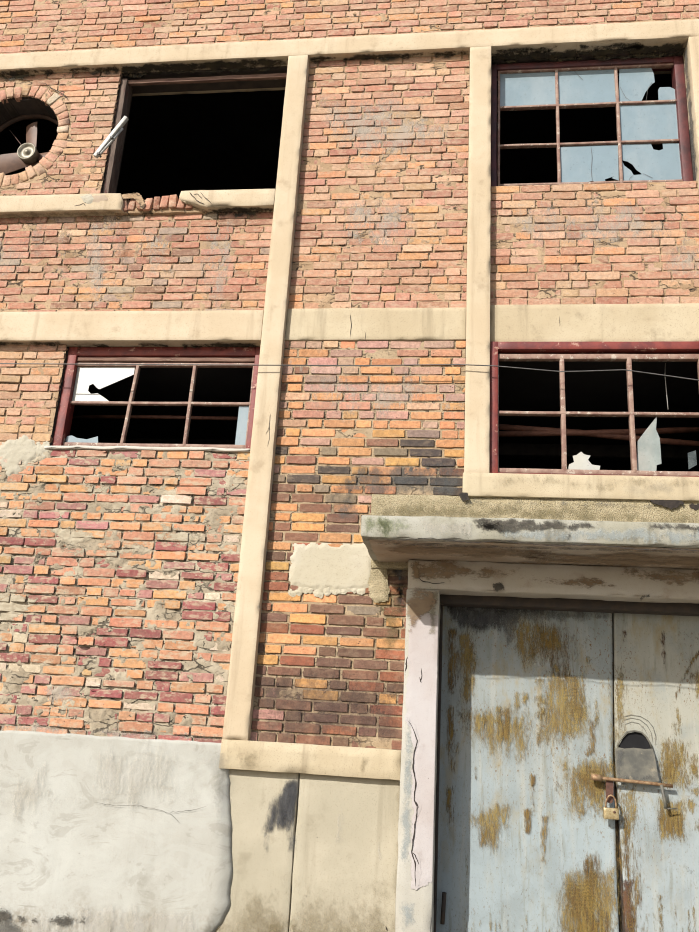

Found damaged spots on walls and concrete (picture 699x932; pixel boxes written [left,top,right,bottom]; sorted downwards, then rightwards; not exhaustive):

leakage [491,42,697,179]
peeling [122,193,193,213]
leakage [380,522,699,569]
peeling [288,568,390,603]
peeling [412,560,515,592]
peeling [550,577,614,588]
peeling [626,568,699,585]
rust [675,651,699,698]
rust [446,617,645,932]
rust [657,710,699,842]
leakage [281,781,298,822]
crack [408,721,419,885]